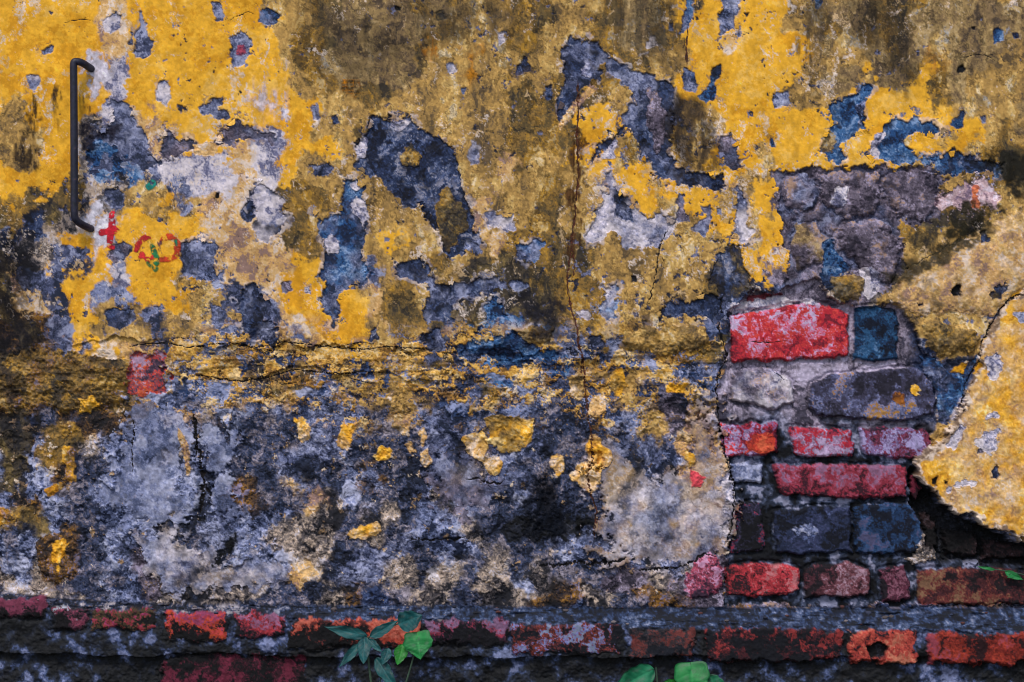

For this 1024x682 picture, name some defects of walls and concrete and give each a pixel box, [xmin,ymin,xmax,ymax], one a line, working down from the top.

peeling [86,98,277,174]
peeling [305,115,545,328]
rust [565,128,587,258]
peeling [545,36,740,250]
peeling [822,84,964,165]
peeling [931,148,1001,213]
crack [192,414,212,513]
crack [130,337,432,385]
peeling [396,260,558,369]
peeling [462,415,533,475]
crack [538,85,736,577]
spalling [658,186,1024,609]